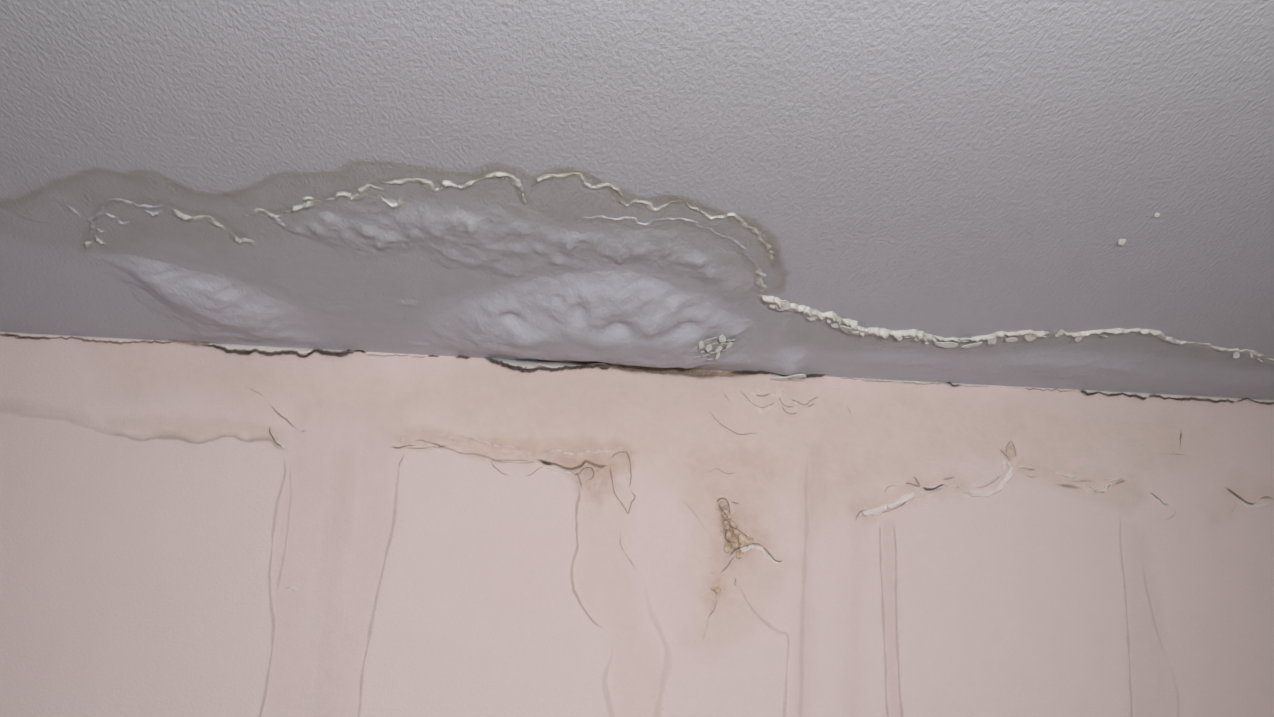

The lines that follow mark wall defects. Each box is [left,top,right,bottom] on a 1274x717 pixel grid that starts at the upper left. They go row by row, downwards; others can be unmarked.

peeling [63,198,257,248]
peeling [243,172,1274,362]
crack [0,333,171,344]
crack [204,344,364,357]
crack [429,355,649,372]
crack [732,370,825,379]
crack [1029,388,1274,405]
crack [394,434,624,476]
peeling [858,459,1034,517]